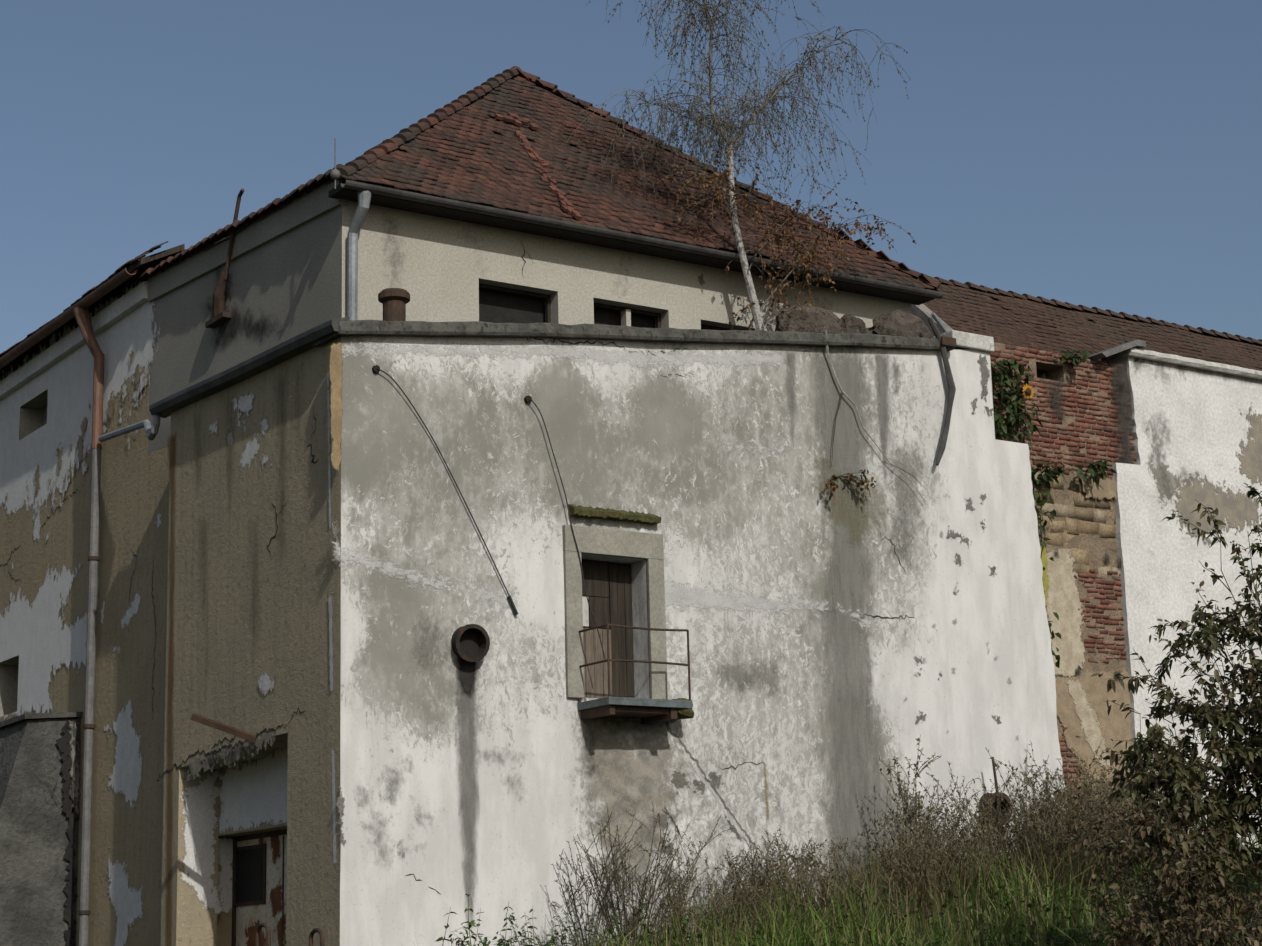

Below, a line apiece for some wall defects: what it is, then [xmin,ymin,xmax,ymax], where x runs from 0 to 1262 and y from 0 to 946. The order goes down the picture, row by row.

peeling [0,300,161,543]
crack [267,503,287,560]
spalling [940,494,987,566]
peeling [1081,476,1117,500]
peeling [1148,402,1262,547]
peeling [0,563,105,721]
leakage [816,352,899,877]
peeling [104,696,144,810]
peeling [180,726,288,915]
leakage [457,657,479,913]
peeling [1067,678,1114,772]
rust [244,881,286,946]